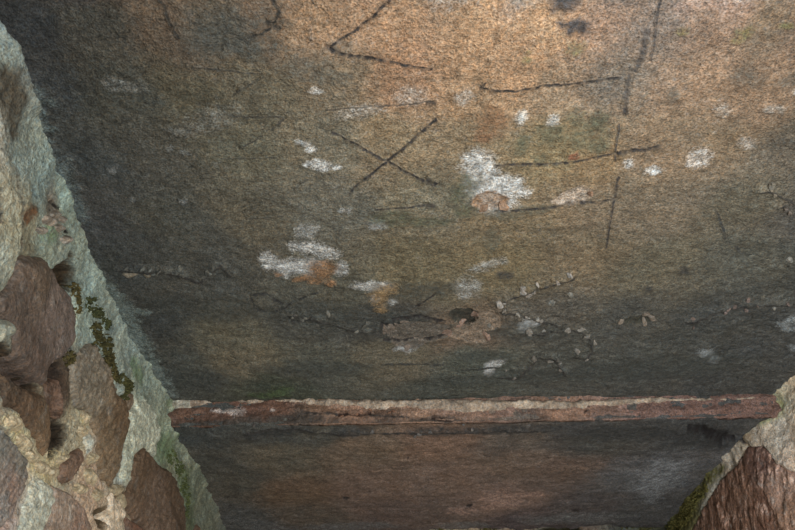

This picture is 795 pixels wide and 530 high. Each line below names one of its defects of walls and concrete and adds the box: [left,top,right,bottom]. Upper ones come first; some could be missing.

water stain [540,0,597,40]
water stain [88,136,762,401]
spalling [382,272,597,361]
water stain [171,404,750,530]